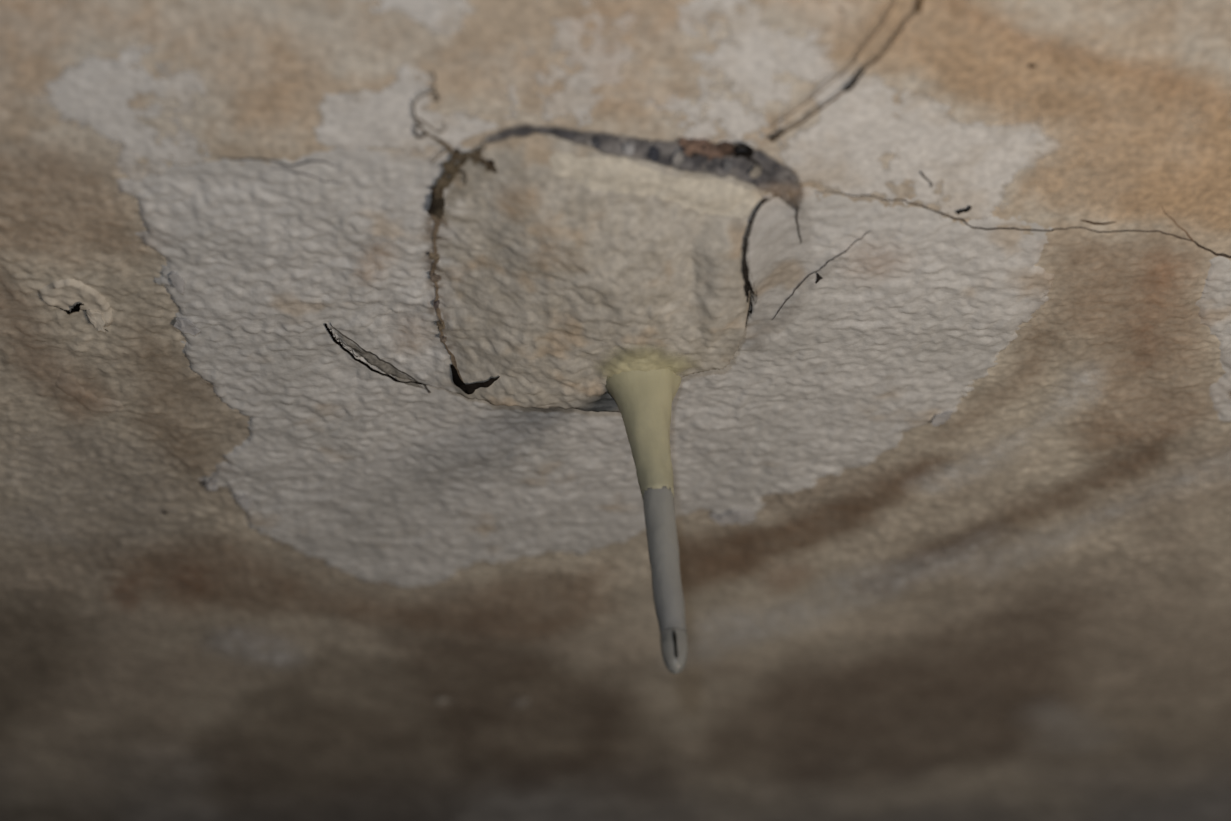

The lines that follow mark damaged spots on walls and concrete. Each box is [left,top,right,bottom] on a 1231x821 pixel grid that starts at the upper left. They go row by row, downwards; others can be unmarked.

water stain [986,31,1060,78]
crack [324,215,500,395]
peeling [35,0,1061,588]
crack [742,190,1231,320]
peeling [1195,256,1231,422]
water stain [685,524,814,581]